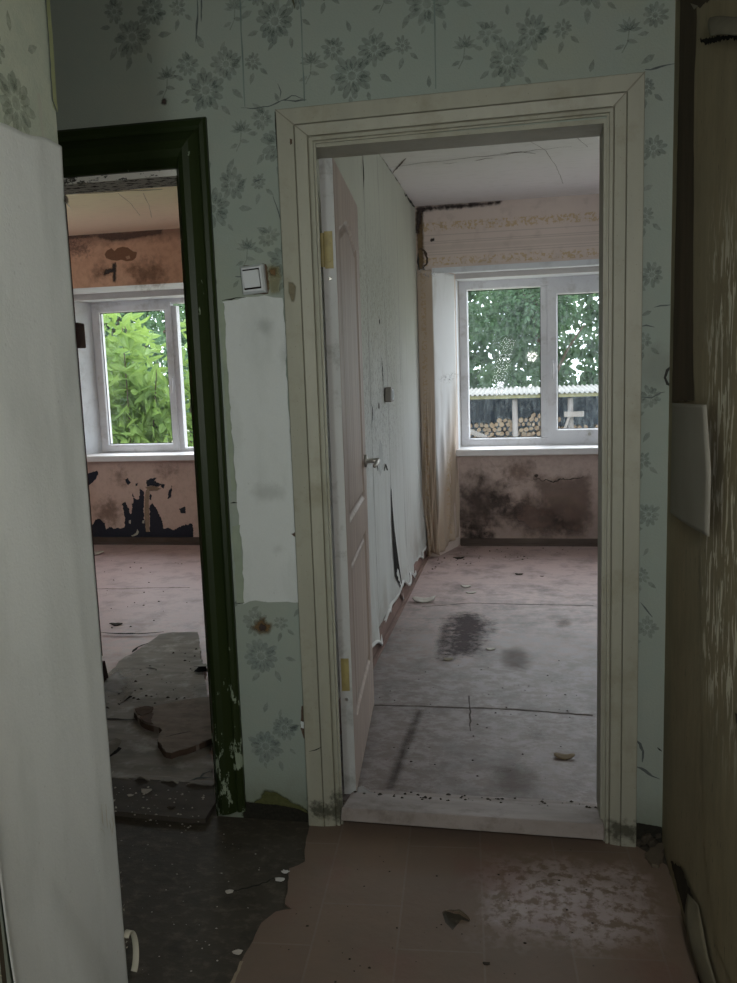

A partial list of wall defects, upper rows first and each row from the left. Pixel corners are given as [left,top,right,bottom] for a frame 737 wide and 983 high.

crack [363,138,588,207]
peeling [92,478,194,537]
damp [460,476,584,538]
damp [441,614,488,656]